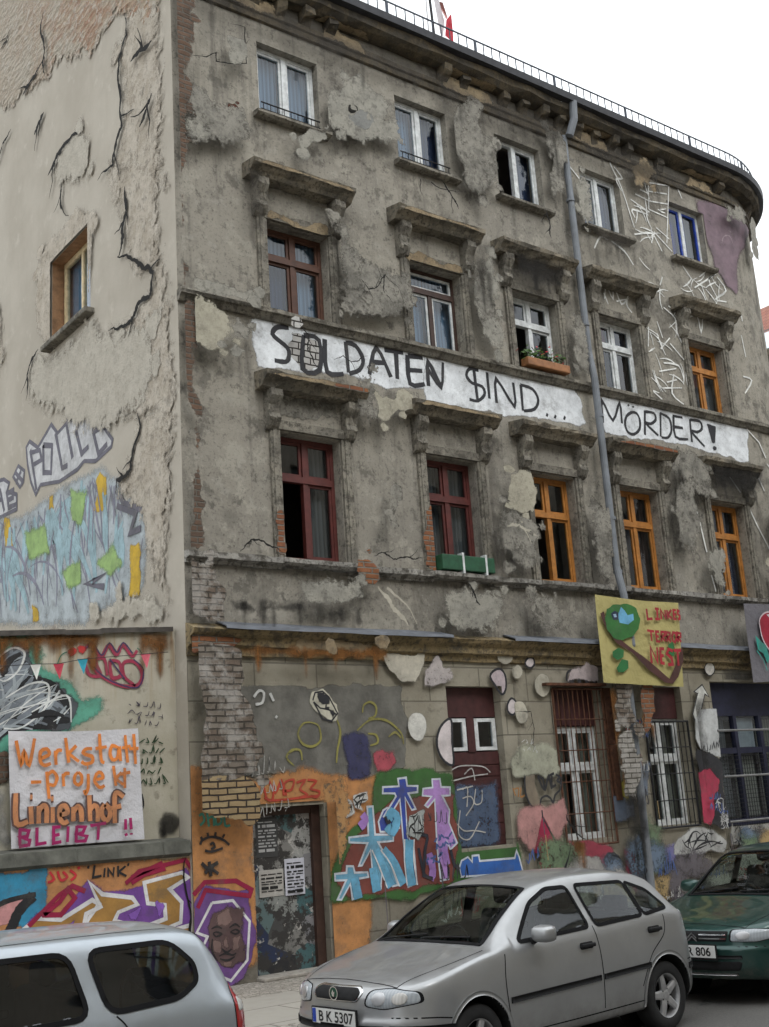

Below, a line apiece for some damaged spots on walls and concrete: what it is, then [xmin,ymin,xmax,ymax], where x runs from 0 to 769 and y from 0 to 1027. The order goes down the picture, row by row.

flaking render [235,0,279,19]
crack [0,16,77,216]
crack [97,13,160,336]
flaking render [0,0,266,627]
flaking render [275,316,499,431]
flaking render [276,510,287,554]
flaking render [438,464,546,636]
flaking render [525,584,562,631]
flaking render [192,635,269,826]
flaking render [615,683,655,797]